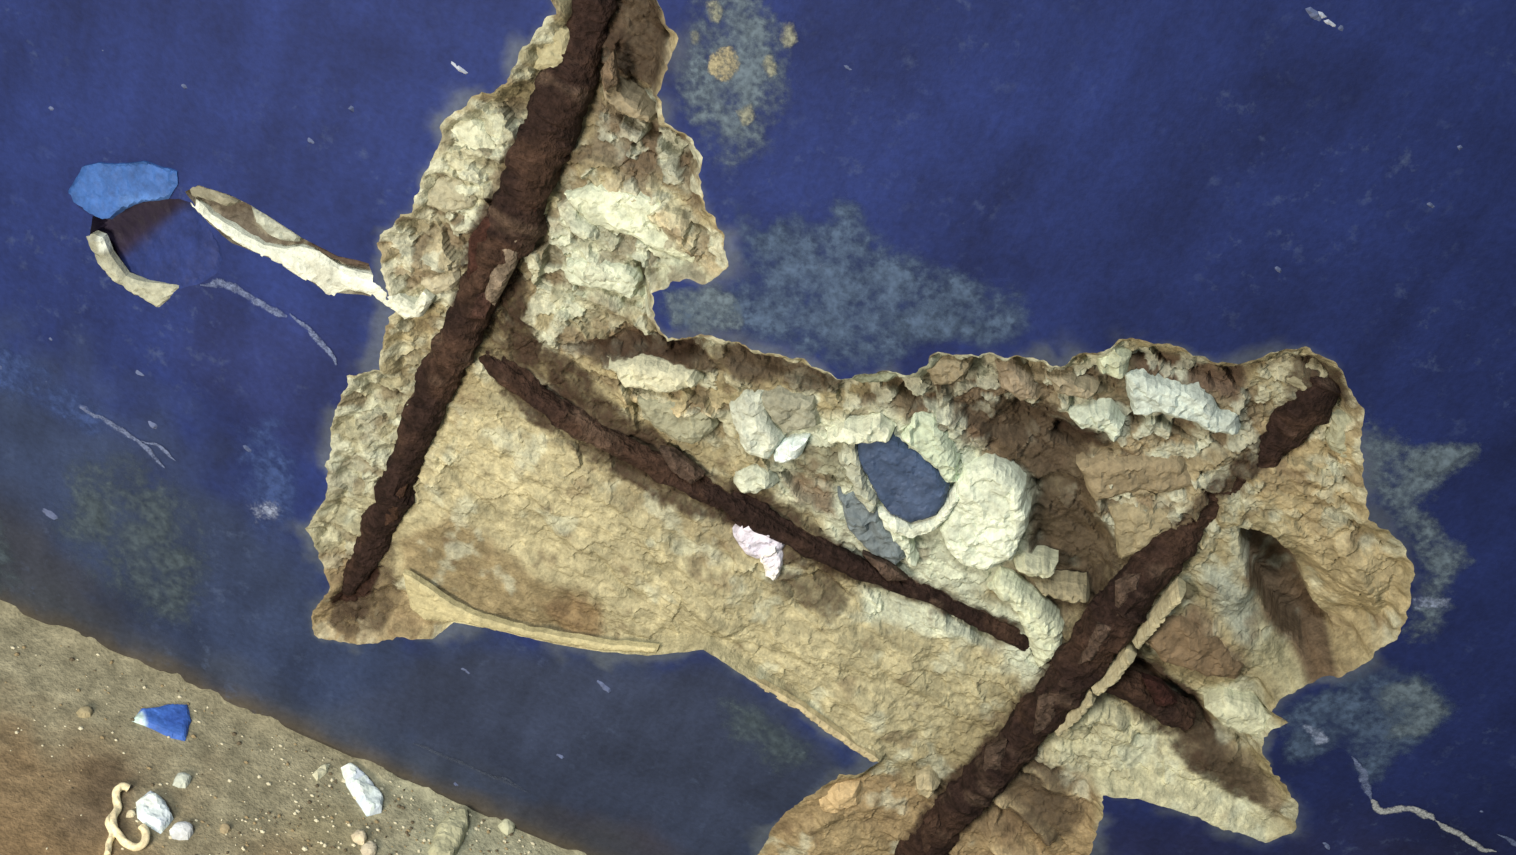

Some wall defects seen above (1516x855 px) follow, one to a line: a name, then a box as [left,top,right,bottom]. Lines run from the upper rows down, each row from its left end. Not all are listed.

peeling [68,160,223,308]
corrosion [330,0,1345,855]
spalling [305,0,1473,855]
crack [1351,756,1516,852]